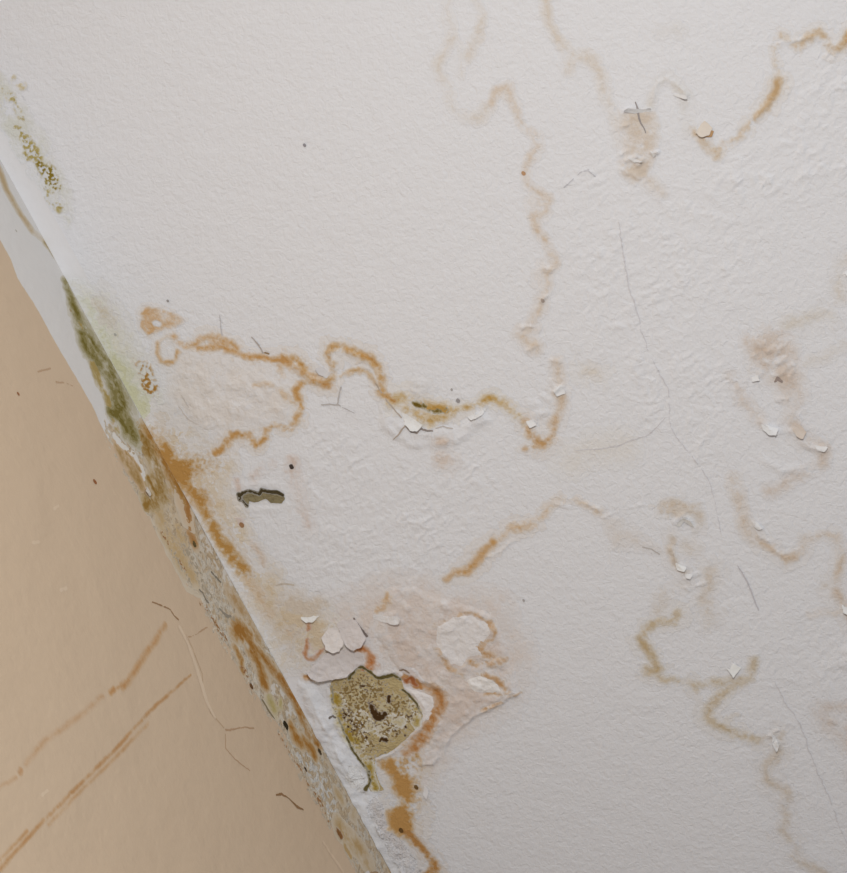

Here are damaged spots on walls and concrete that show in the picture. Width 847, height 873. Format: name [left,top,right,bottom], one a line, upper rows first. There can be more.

leakage [0,164,55,260]
leakage [0,70,75,230]
leakage [538,0,847,200]
spalling [243,493,285,507]
flaking render [160,519,266,704]
leakage [0,673,192,873]
spalling [307,619,423,791]